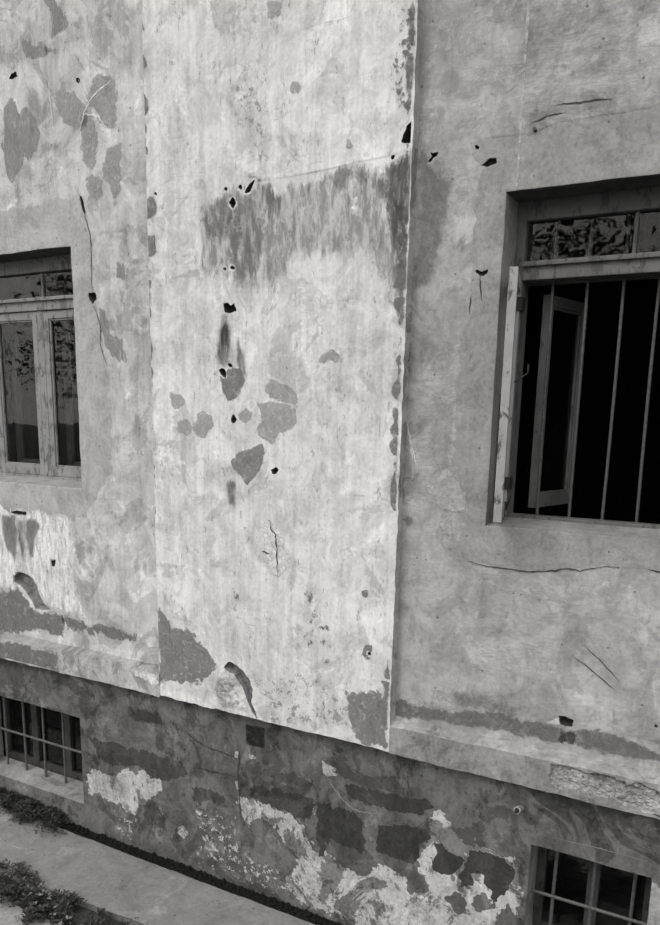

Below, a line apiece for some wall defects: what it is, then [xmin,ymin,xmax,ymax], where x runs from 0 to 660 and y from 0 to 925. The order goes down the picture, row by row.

crack [530,98,608,124]
crack [468,561,617,573]
flaking render [14,572,50,610]
flaking render [224,662,257,719]
spalling [546,716,573,727]
peeling [86,737,189,816]
peeling [322,761,336,776]
spalling [548,764,660,815]
flaking render [192,781,524,925]